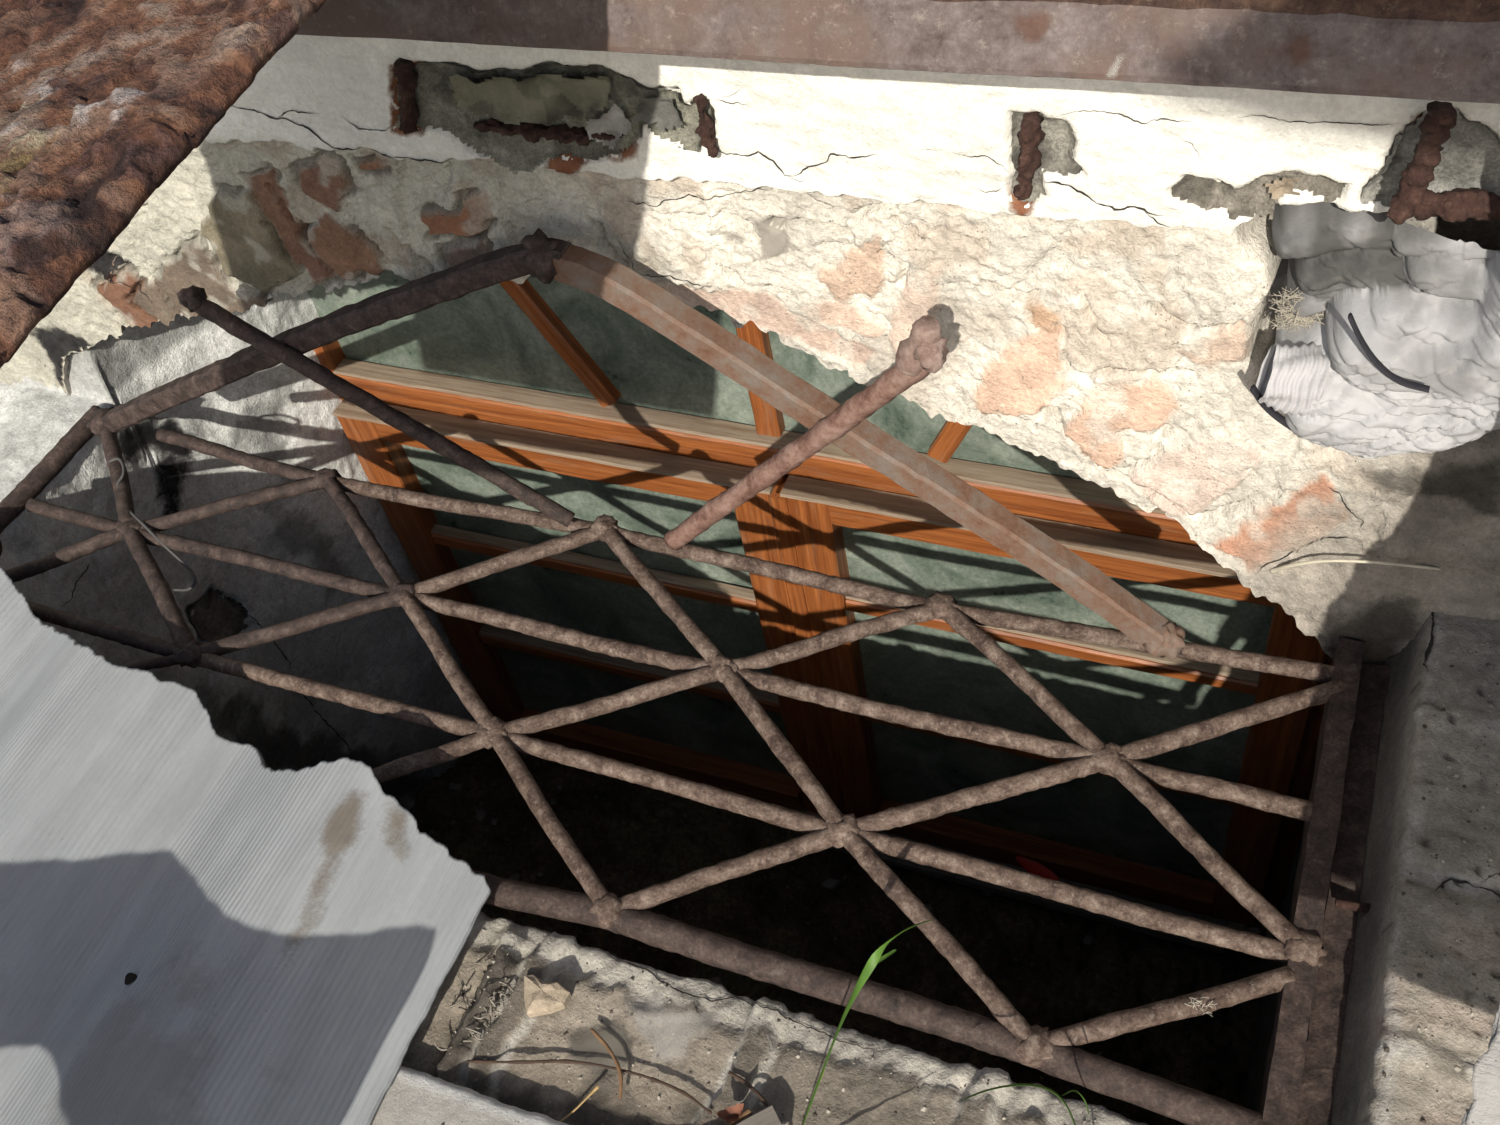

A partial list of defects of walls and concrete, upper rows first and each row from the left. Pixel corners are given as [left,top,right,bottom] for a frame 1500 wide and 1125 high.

crack [232,105,482,163]
corrosion [389,65,426,136]
spalling [392,58,719,175]
crack [629,143,871,207]
crack [918,148,1008,193]
corrosion [1010,192,1034,216]
crack [1046,181,1167,227]
spalling [1171,101,1500,225]